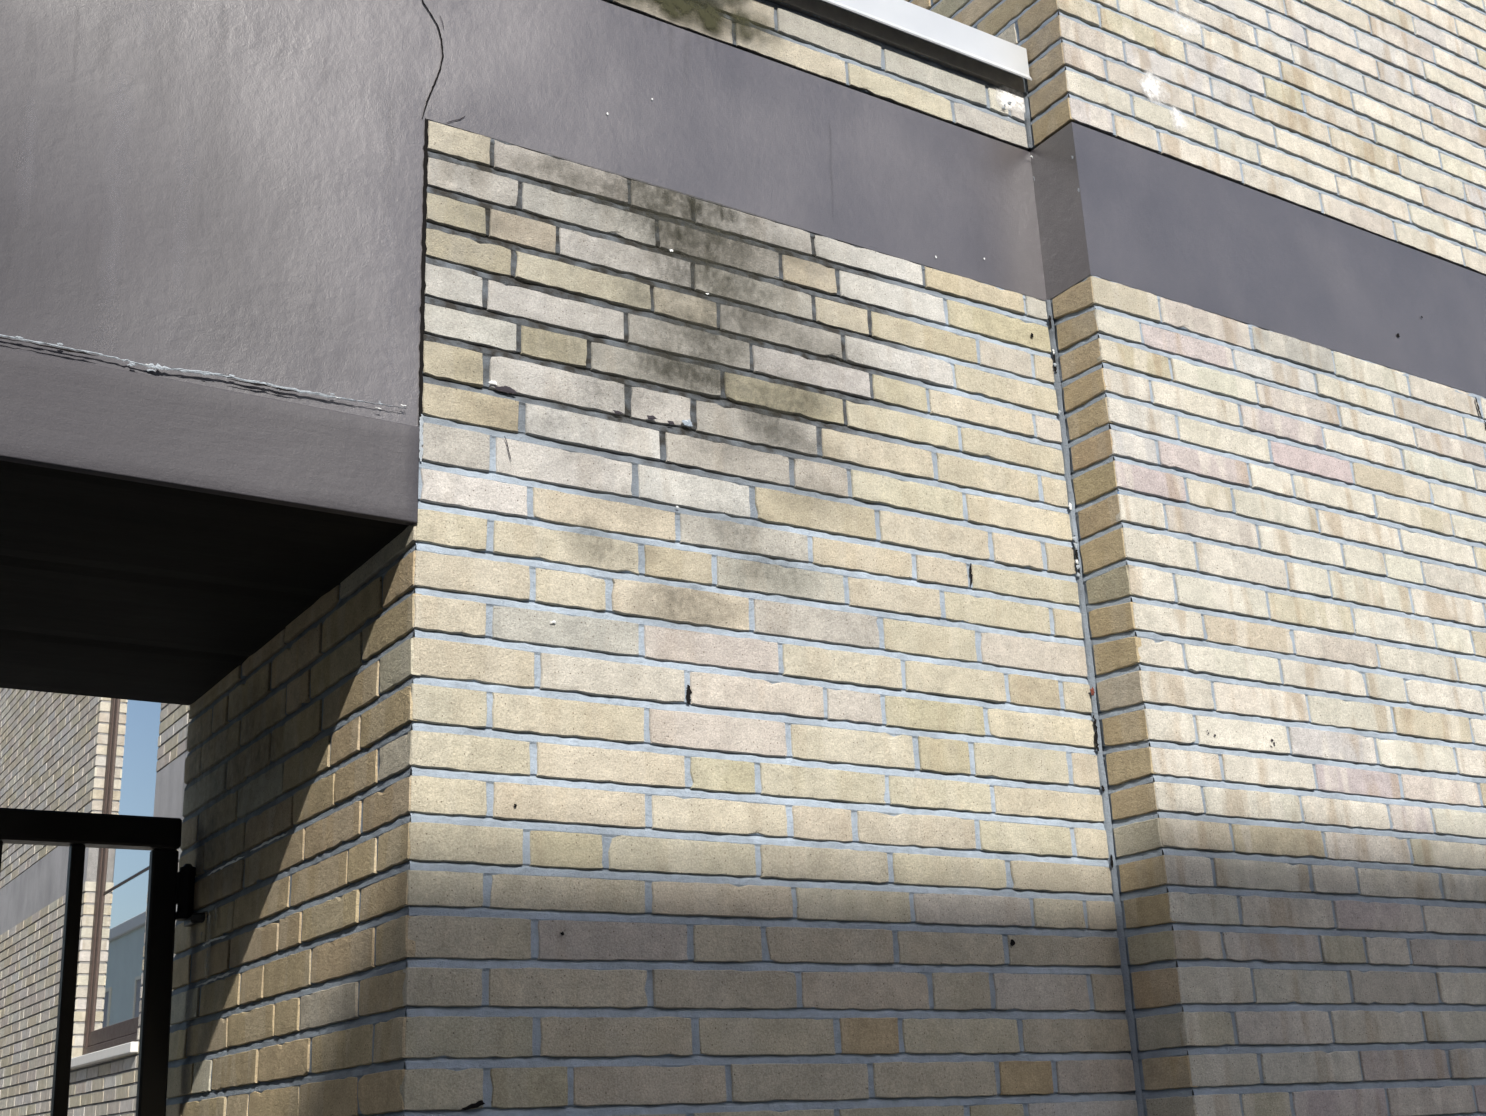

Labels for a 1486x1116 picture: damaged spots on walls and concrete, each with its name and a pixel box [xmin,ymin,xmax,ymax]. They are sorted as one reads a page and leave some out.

damp [651,0,760,38]
crack [419,0,465,423]
damp [599,179,766,352]